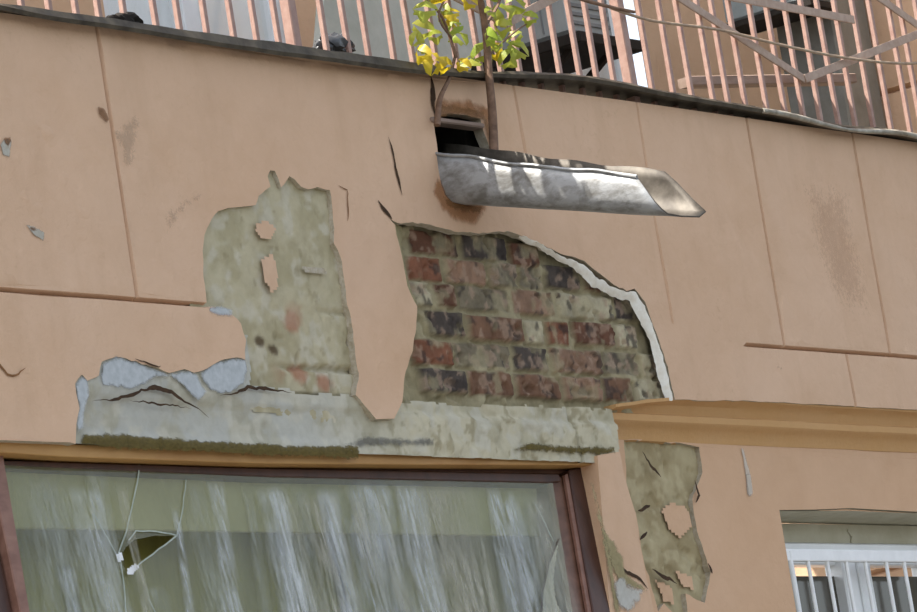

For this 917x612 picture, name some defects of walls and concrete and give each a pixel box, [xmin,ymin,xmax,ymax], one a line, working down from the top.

crack [389,139,402,193]
crack [378,200,392,219]
flaking render [395,224,673,413]
crack [0,364,25,377]
flaking render [593,441,713,612]